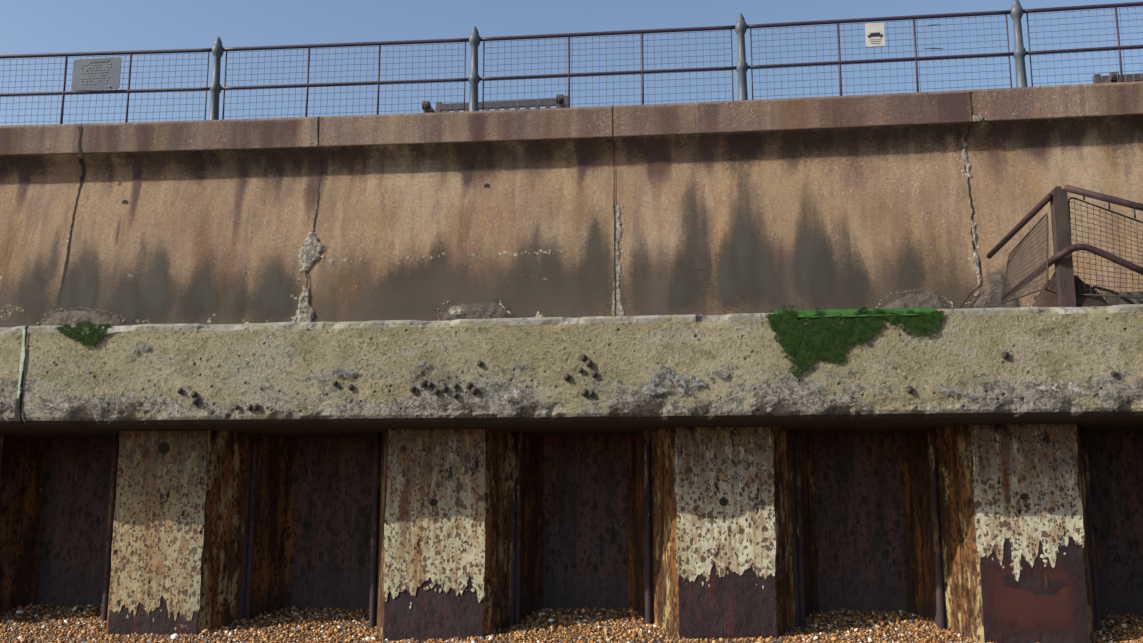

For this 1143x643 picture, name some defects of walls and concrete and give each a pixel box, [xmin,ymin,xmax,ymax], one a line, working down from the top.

crack [54,127,86,306]
water stain [0,218,301,327]
crack [313,117,323,234]
spalling [289,231,563,322]
water stain [312,185,976,322]
crack [960,91,982,309]
peeling [109,431,208,631]
peeling [384,429,486,609]
peeling [675,427,776,589]
peeling [971,424,1084,581]